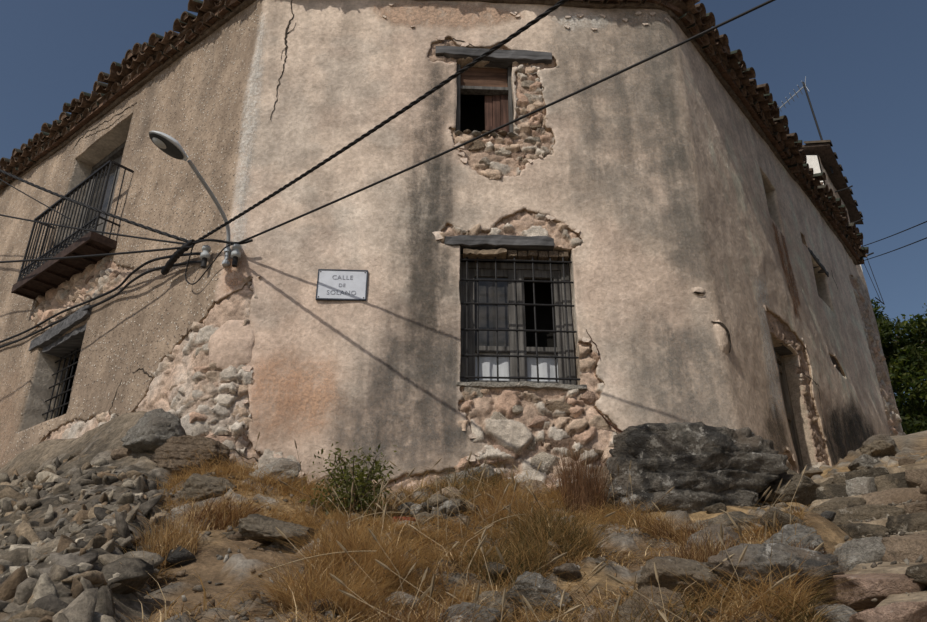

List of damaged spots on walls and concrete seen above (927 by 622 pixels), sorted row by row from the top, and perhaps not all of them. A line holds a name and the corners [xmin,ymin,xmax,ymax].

crack [270,0,296,120]
peeling [374,3,520,28]
spalling [428,36,559,180]
spalling [40,411,119,443]
spalling [31,256,136,331]
spalling [130,276,307,485]
water stain [353,67,467,468]
spalling [372,337,622,493]
spalling [432,211,584,264]
spalling [764,305,829,470]
water stain [826,403,874,465]
spalling [849,275,906,436]